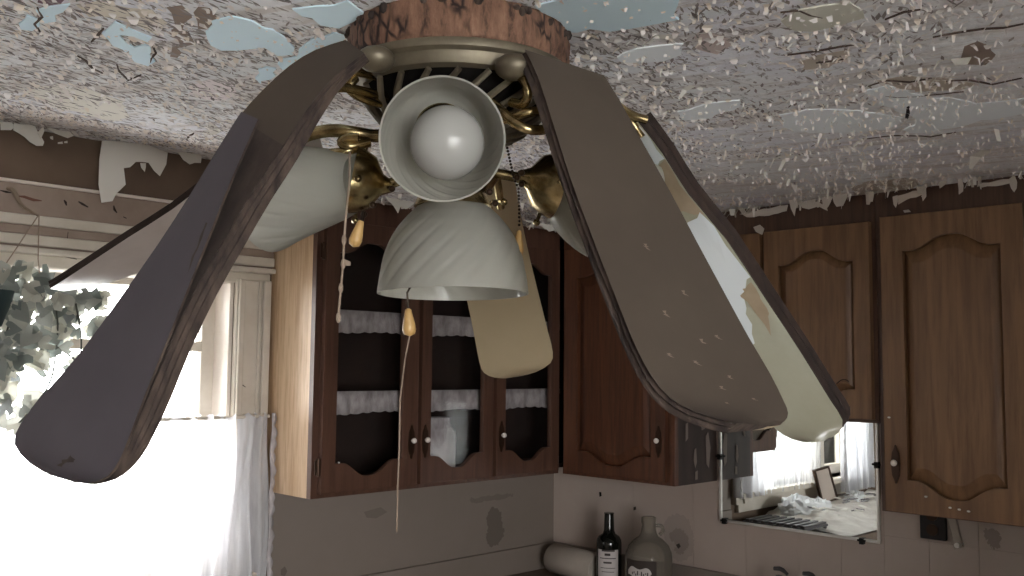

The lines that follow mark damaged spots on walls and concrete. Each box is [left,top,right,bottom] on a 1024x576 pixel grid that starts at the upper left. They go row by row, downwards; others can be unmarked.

crack [33,7,44,33]
crack [780,9,820,18]
crack [885,9,921,20]
crack [933,23,1024,38]
crack [77,28,157,81]
crack [787,44,854,64]
crack [868,77,1023,98]
peeling [0,0,364,219]
peeling [319,94,381,129]
peeling [511,0,1024,235]
peeling [502,123,551,172]
crack [867,131,956,139]